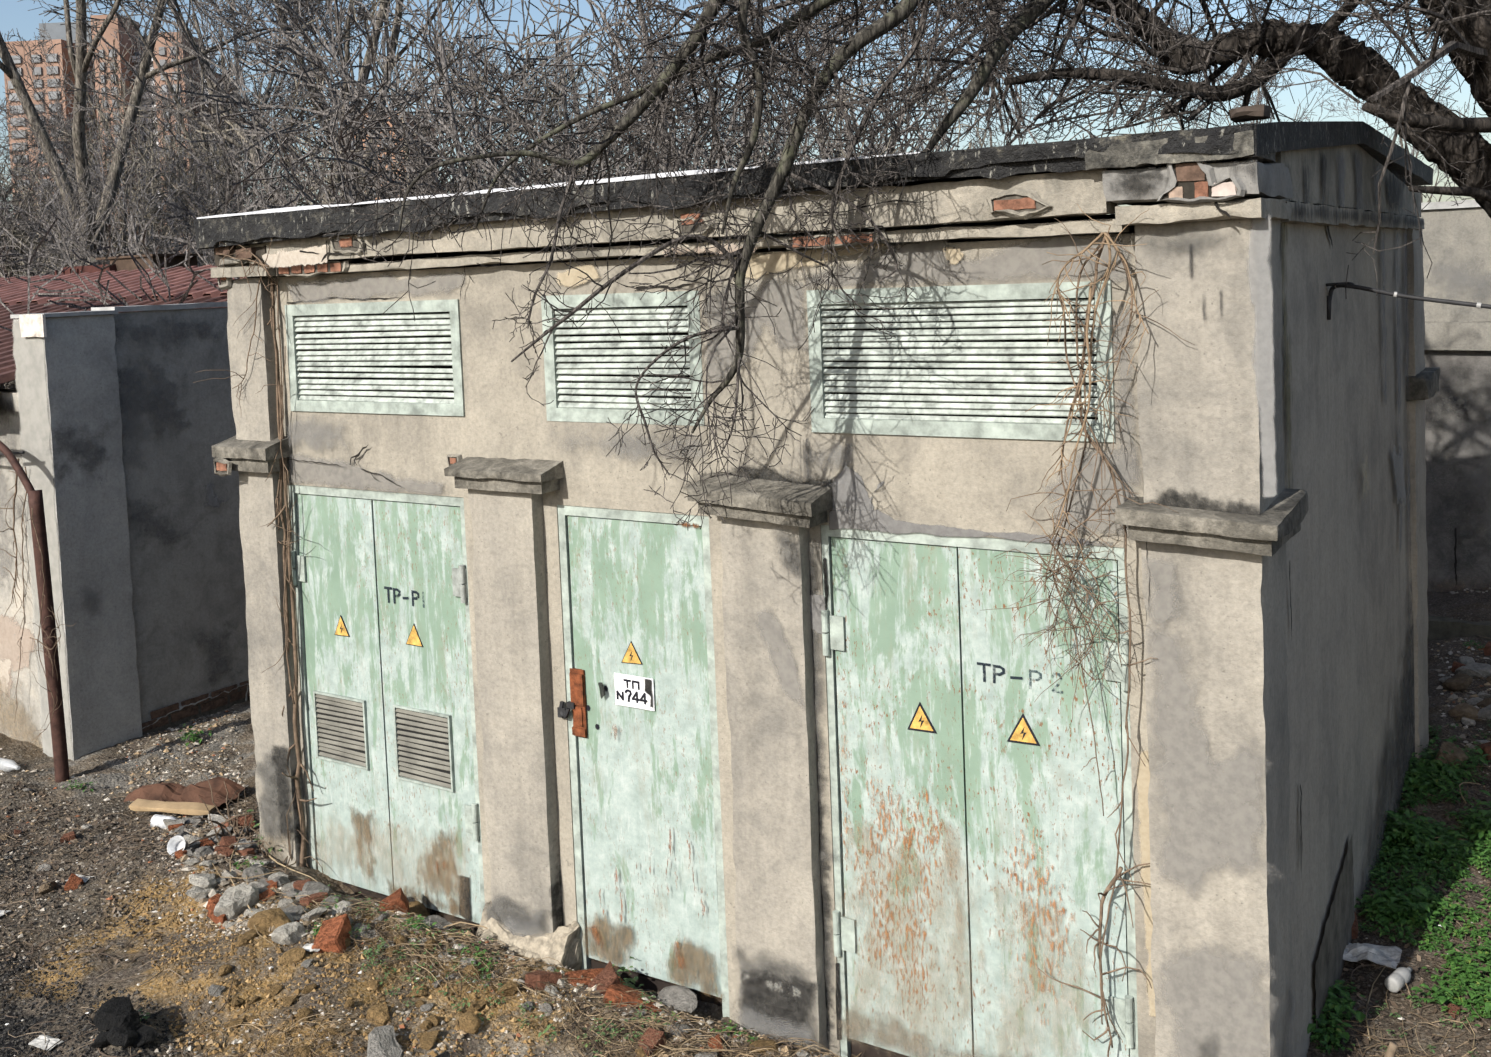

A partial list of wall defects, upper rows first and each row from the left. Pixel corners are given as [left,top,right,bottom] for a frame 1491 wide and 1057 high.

flaking render [1157,161,1246,204]
peeling [214,234,365,290]
peeling [663,213,890,279]
peeling [944,247,963,264]
damp [1280,153,1424,547]
damp [735,534,832,1040]
corrosion [352,814,372,874]
corrosion [390,834,459,915]
corrosion [841,701,952,1012]
corrosion [584,868,632,966]
corrosion [1006,814,1085,1024]
corrosion [668,941,717,997]